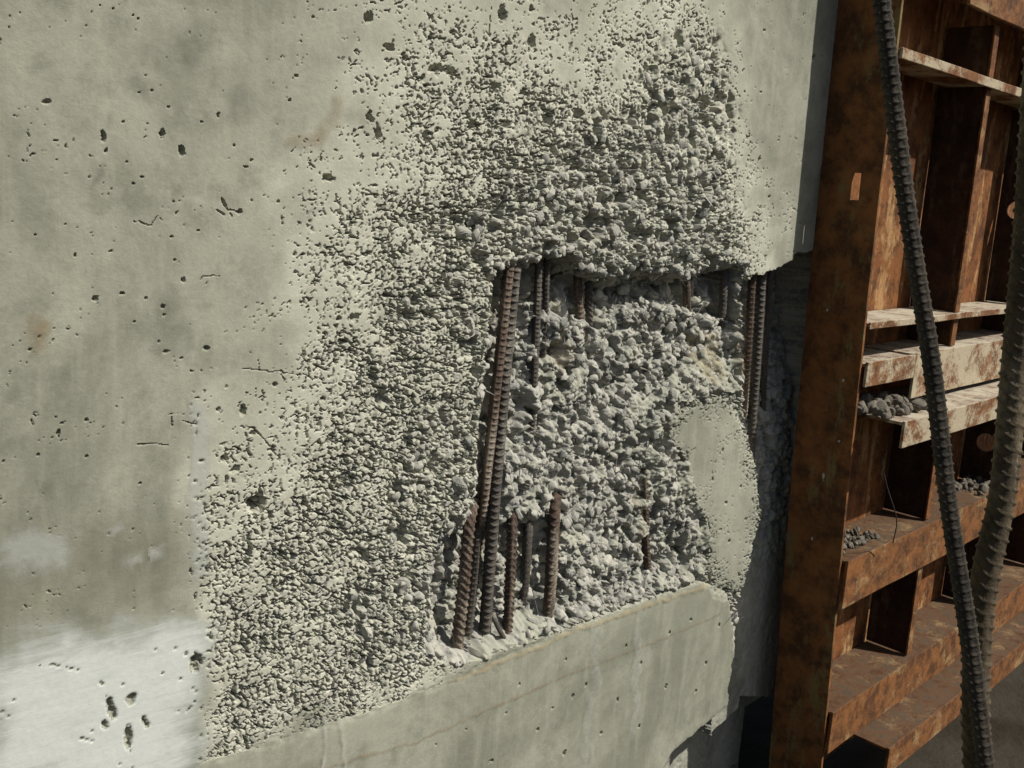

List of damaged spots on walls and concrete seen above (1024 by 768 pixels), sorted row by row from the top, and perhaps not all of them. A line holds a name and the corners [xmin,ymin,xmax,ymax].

hole [220,453,241,473]
spalling [422,243,812,768]